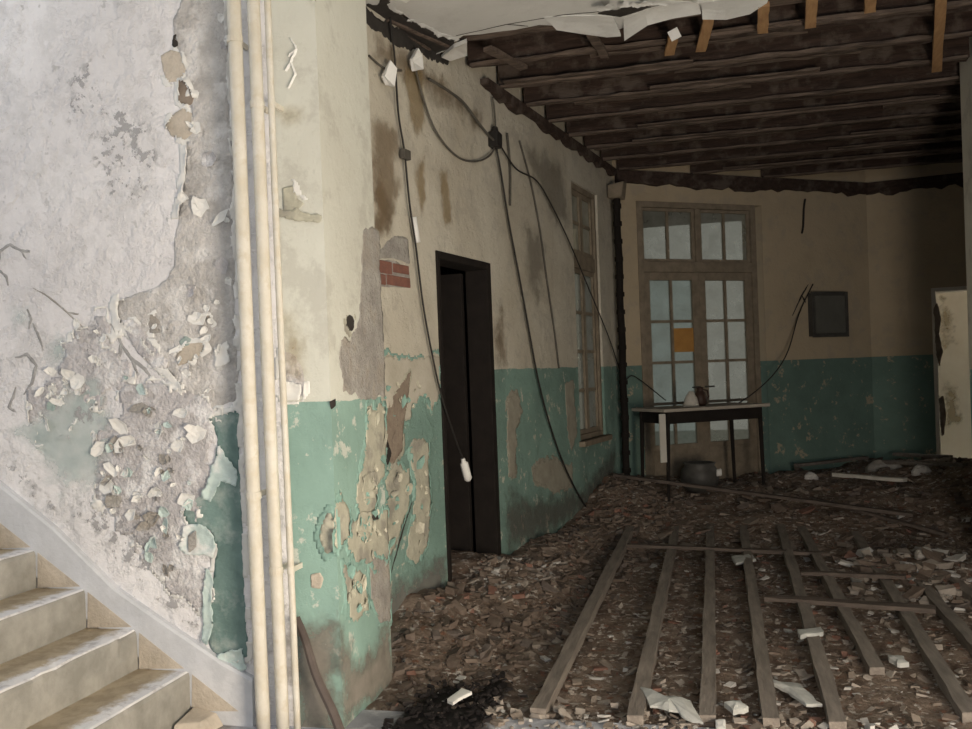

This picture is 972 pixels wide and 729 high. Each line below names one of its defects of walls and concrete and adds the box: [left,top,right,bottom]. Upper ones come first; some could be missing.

spalling [366,0,467,71]
peeling [543,0,768,41]
peeling [381,60,397,87]
water stain [388,50,451,100]
water stain [375,127,397,229]
peeling [24,0,253,671]
spalling [313,226,441,628]
peeling [505,389,523,479]
peeling [311,573,324,589]